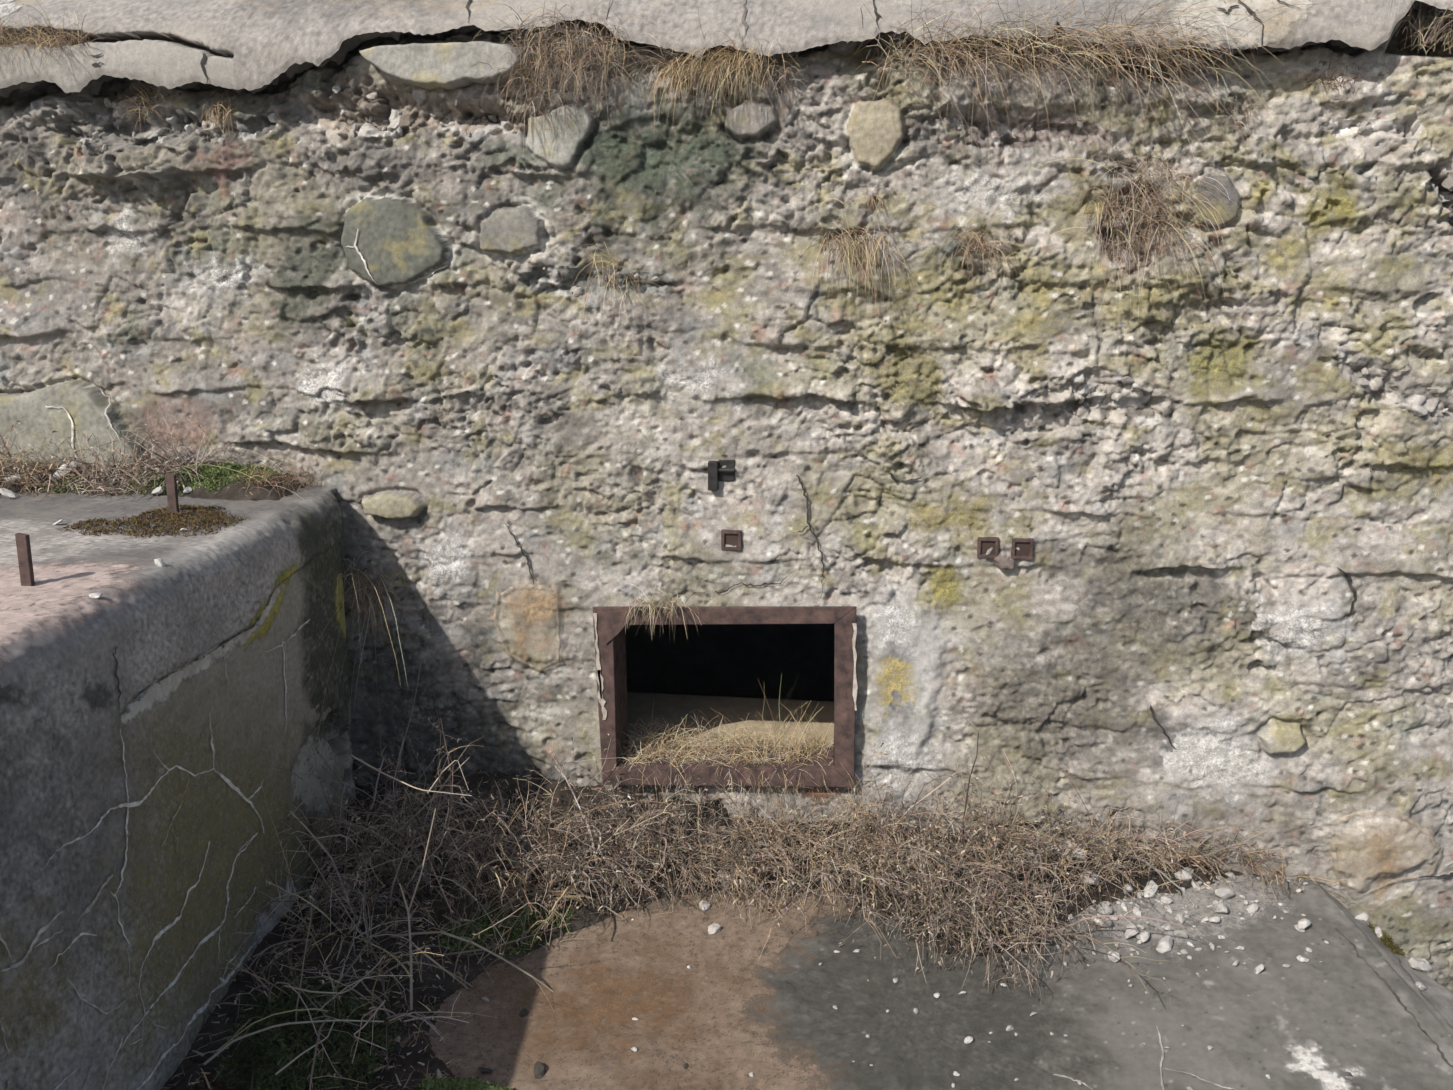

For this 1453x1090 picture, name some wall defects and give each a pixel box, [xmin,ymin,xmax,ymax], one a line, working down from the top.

crack [1217,0,1293,46]
crack [200,53,208,84]
spalling [1428,164,1453,227]
rust [804,787,837,801]
crack [0,553,319,1090]
crack [1419,871,1453,879]